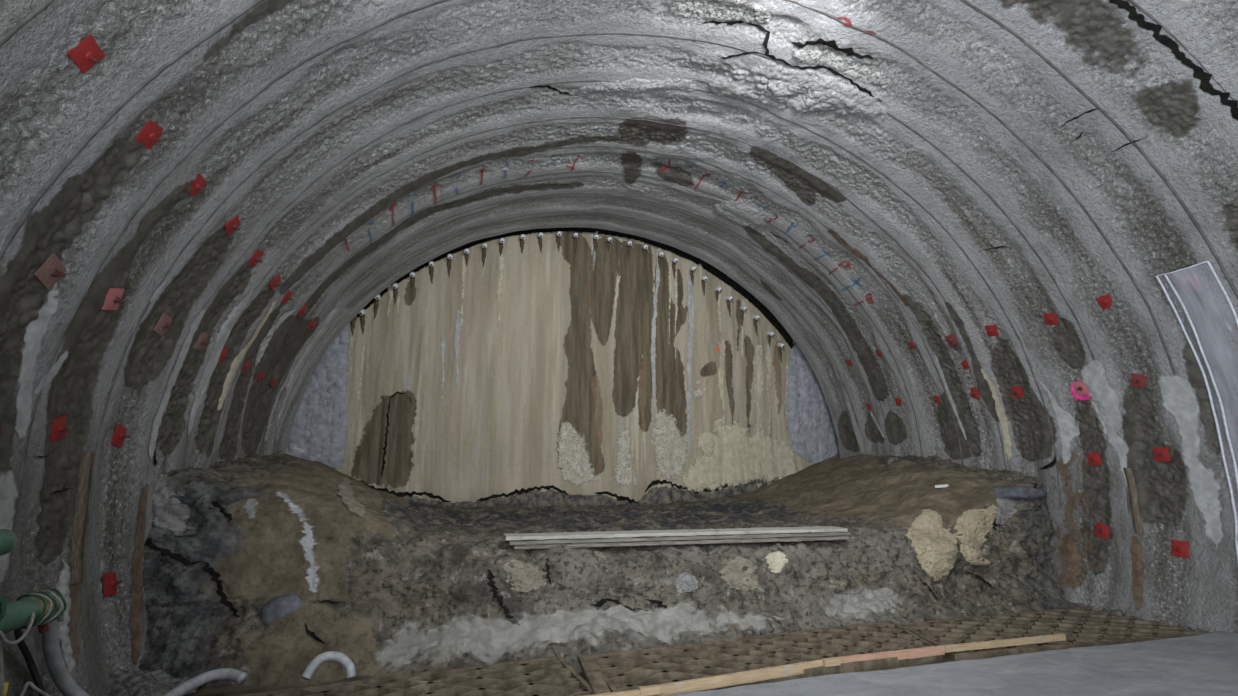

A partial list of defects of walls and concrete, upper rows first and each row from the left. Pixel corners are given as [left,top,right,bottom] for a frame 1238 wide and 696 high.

crack [703,20,883,102]
crack [1109,0,1238,121]
crack [1061,108,1101,142]
leakage [125,117,694,461]
leakage [520,231,798,492]
leakage [351,391,416,488]